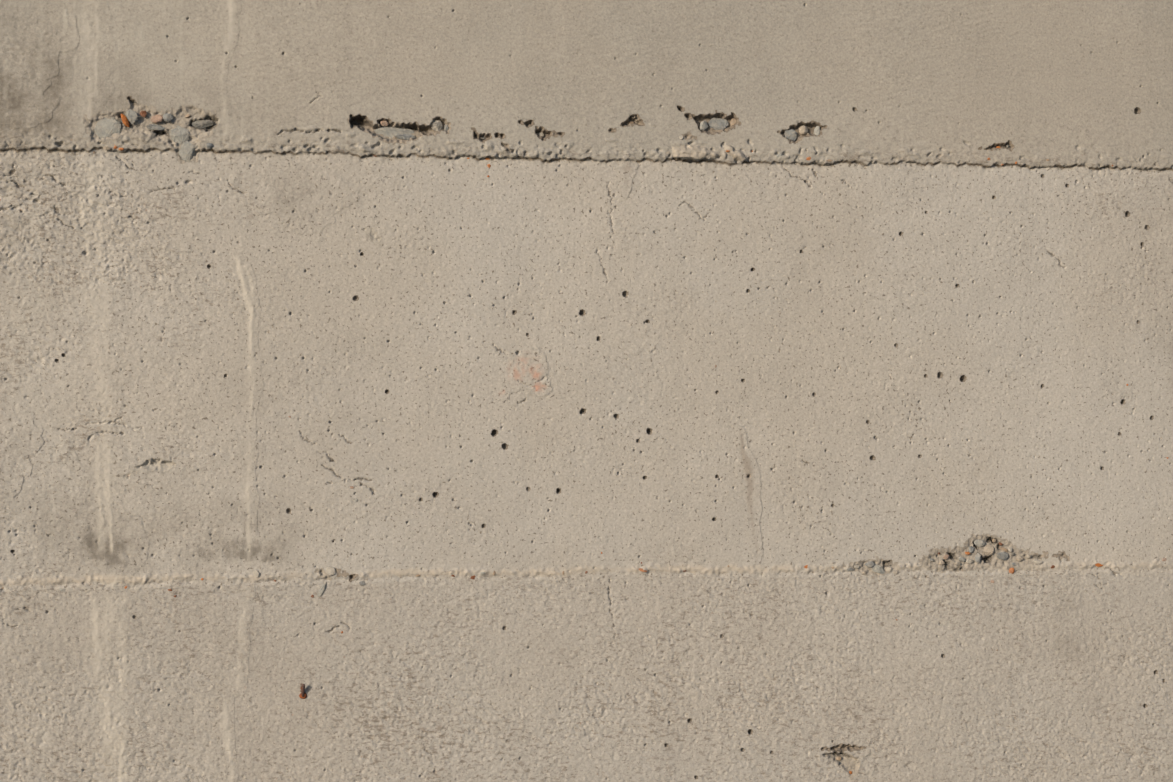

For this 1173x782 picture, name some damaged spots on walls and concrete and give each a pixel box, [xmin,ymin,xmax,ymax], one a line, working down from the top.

leakage [0,0,115,139]
leakage [217,0,241,140]
spalling [82,95,219,164]
spalling [347,114,451,144]
spalling [677,105,741,141]
spalling [777,120,827,144]
leakage [218,159,359,235]
leakage [48,153,153,782]
leakage [176,252,302,782]
spalling [919,534,1070,583]